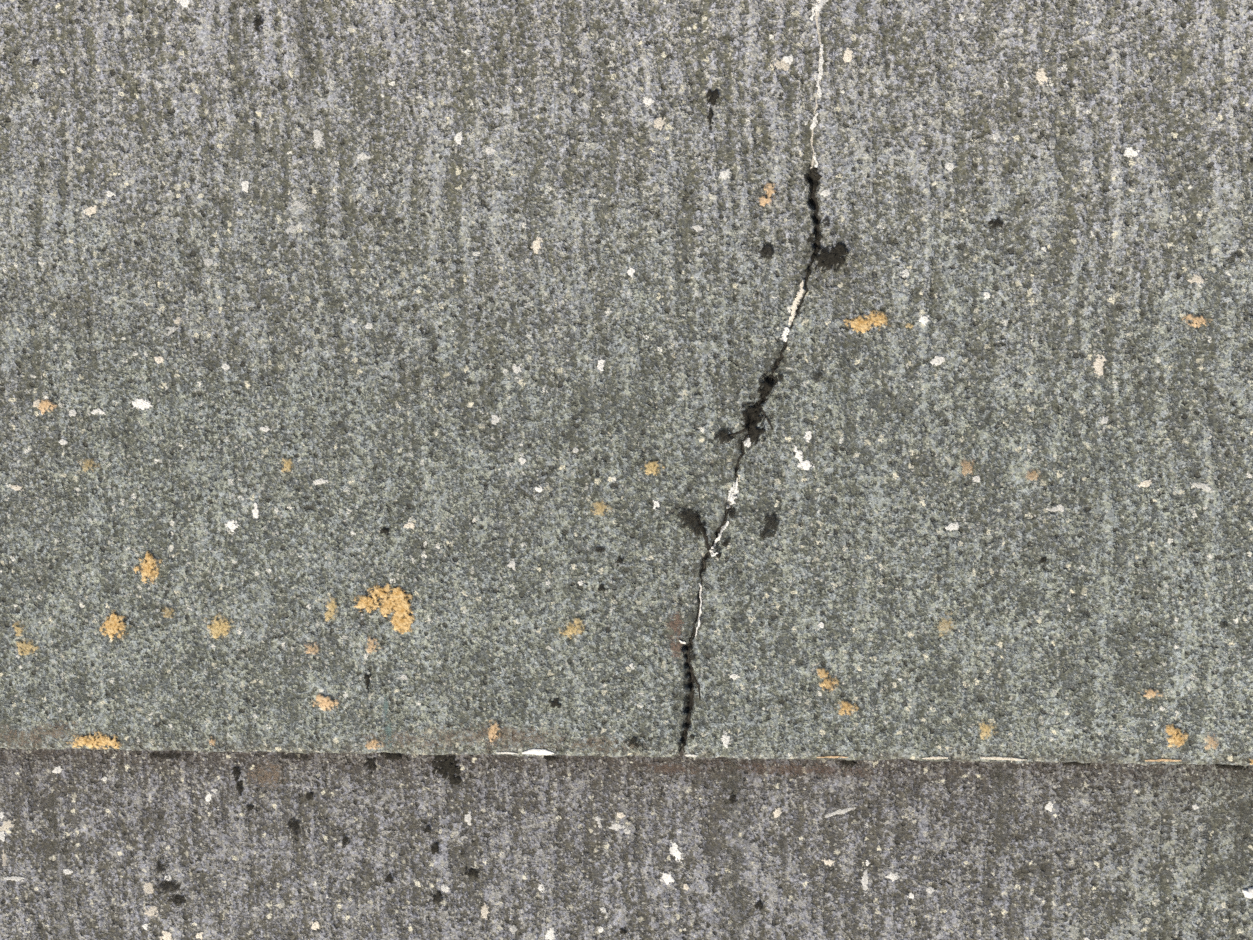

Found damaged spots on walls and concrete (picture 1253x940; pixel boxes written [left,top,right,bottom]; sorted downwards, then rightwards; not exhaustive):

crack [677,0,851,752]